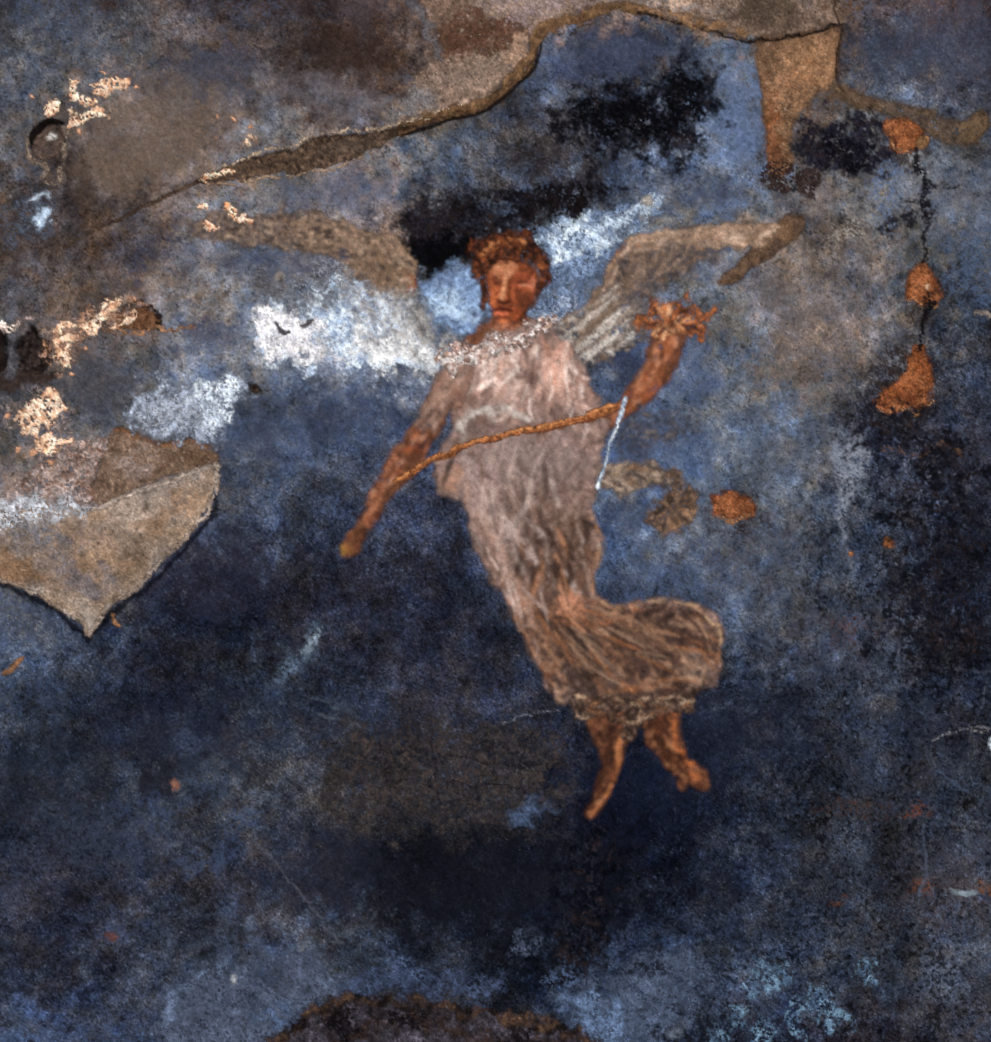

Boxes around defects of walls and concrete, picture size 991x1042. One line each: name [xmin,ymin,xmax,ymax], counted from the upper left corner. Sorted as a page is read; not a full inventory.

peeling [44,71,138,134]
crack [65,24,592,248]
water stain [396,53,724,325]
crack [637,0,845,92]
flaking render [0,293,220,643]